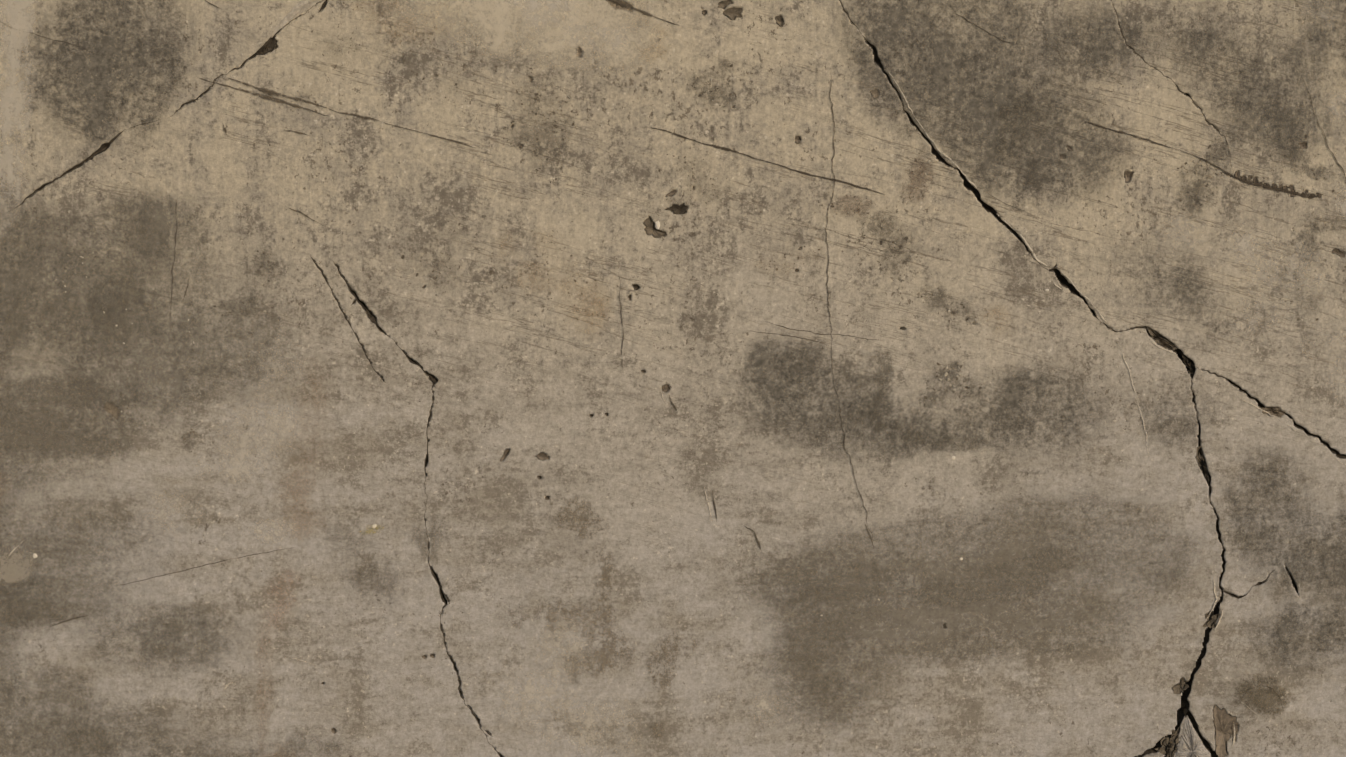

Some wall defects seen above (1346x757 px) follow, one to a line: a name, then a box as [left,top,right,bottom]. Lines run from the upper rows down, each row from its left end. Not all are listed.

crack [12,0,327,211]
crack [311,257,502,757]
crack [754,76,876,536]
crack [839,0,1346,757]